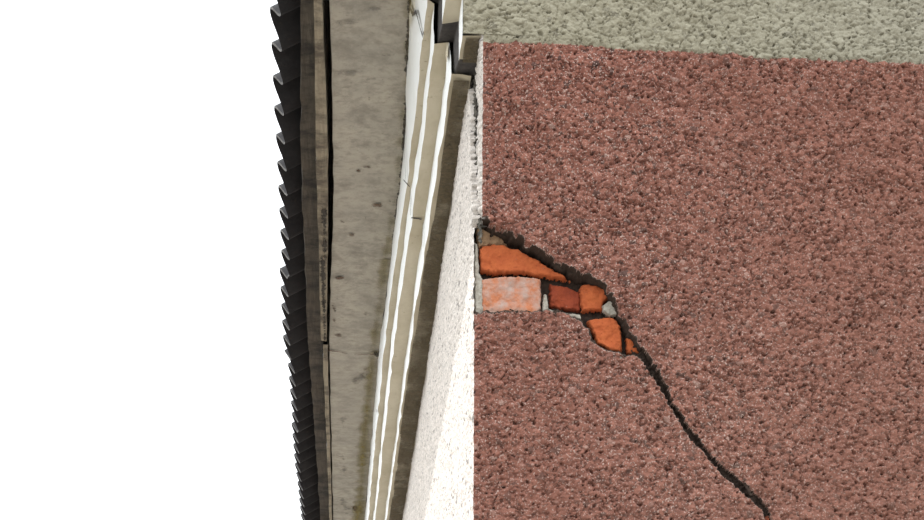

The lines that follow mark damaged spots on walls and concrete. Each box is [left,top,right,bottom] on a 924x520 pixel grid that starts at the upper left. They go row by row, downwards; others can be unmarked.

flaking render [473,226,639,359]
crack [631,345,769,520]